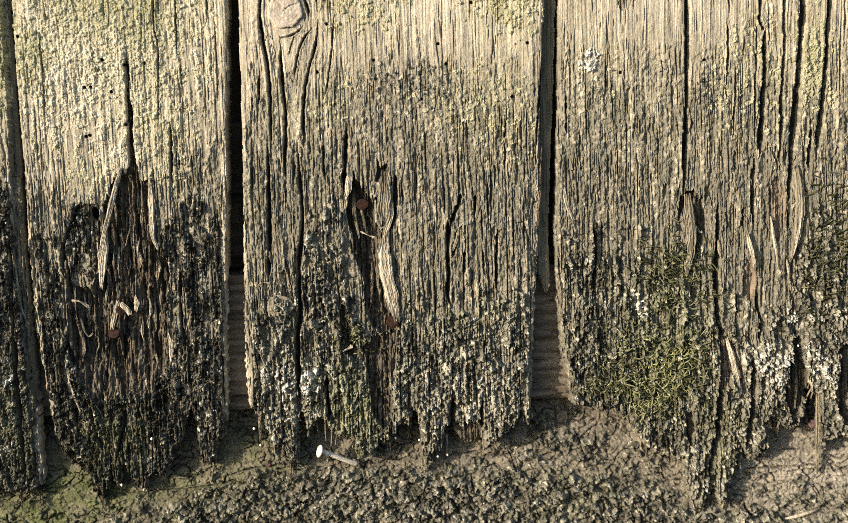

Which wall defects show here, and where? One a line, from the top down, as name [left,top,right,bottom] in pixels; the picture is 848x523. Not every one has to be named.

crack [126,59,136,172]
damp [346,59,457,122]
crack [741,0,845,236]
crack [712,194,723,348]
crack [708,389,720,478]